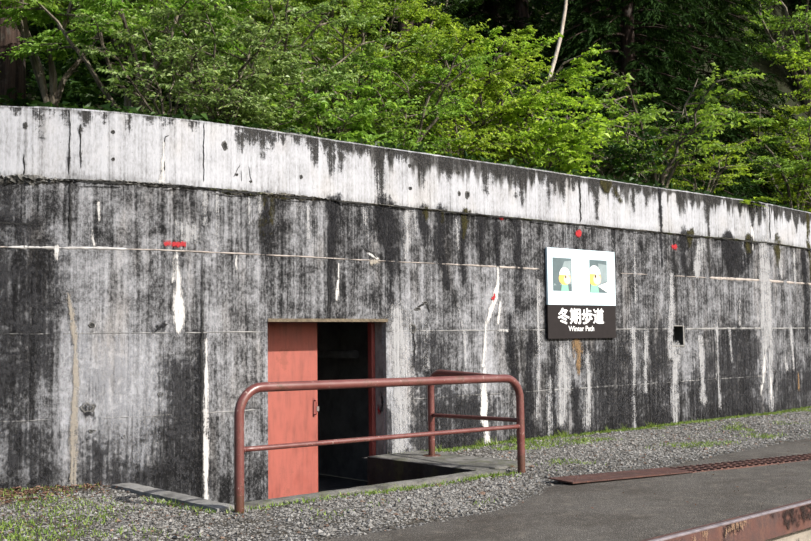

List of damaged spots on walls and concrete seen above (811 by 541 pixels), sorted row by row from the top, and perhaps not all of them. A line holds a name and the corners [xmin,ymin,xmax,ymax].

leakage [0,126,811,500]